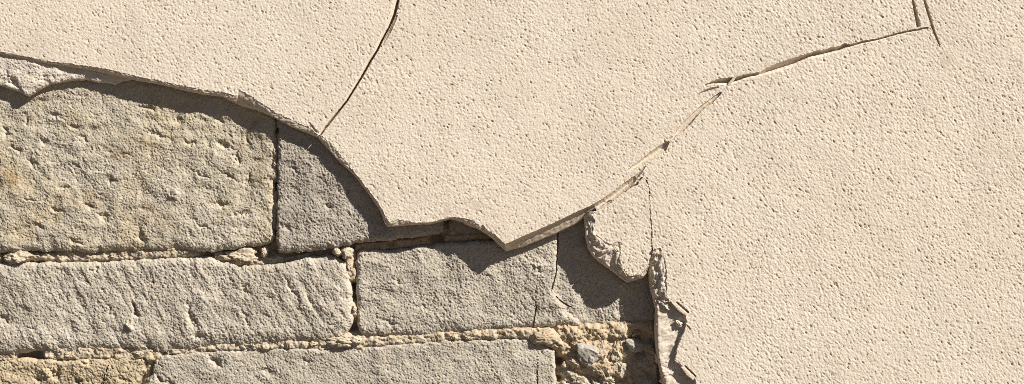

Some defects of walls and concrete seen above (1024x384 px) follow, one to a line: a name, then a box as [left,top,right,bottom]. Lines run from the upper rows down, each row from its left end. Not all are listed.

crack [309,0,400,135]
crack [594,0,940,217]
spalling [0,52,697,384]